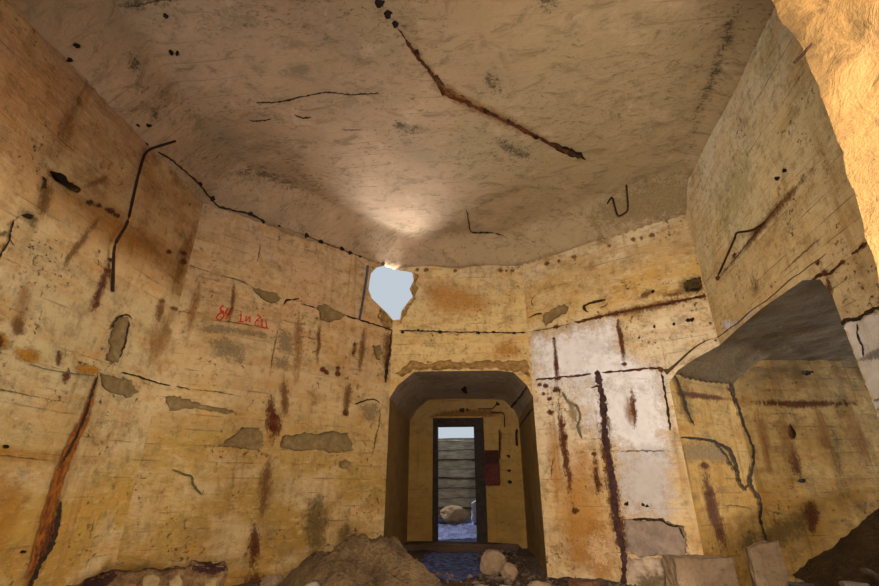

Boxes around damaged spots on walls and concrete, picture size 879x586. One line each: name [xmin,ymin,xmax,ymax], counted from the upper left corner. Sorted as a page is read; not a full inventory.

crack [375,0,586,160]
crack [158,152,385,266]
rust [715,179,803,281]
peeling [106,314,132,363]
peeling [100,373,139,398]
peeling [165,395,237,414]
peeling [218,427,264,451]
rust [265,381,289,443]
peeling [280,431,354,469]
rust [537,334,572,493]
rust [591,452,601,493]
crack [727,384,768,541]